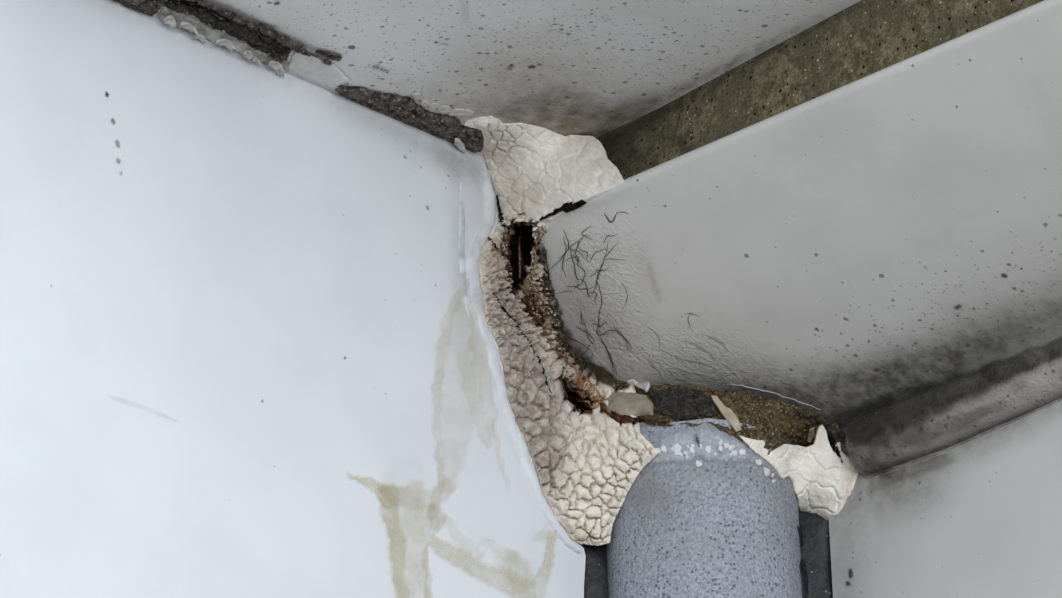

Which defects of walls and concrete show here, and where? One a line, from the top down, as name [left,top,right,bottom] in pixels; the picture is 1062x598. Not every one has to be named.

peeling [157,6,349,89]
peeling [523,262,546,278]
corrosion [492,219,670,425]
crack [546,212,632,374]
peeling [561,364,599,398]
damp [832,338,1062,441]
peeling [650,395,776,484]